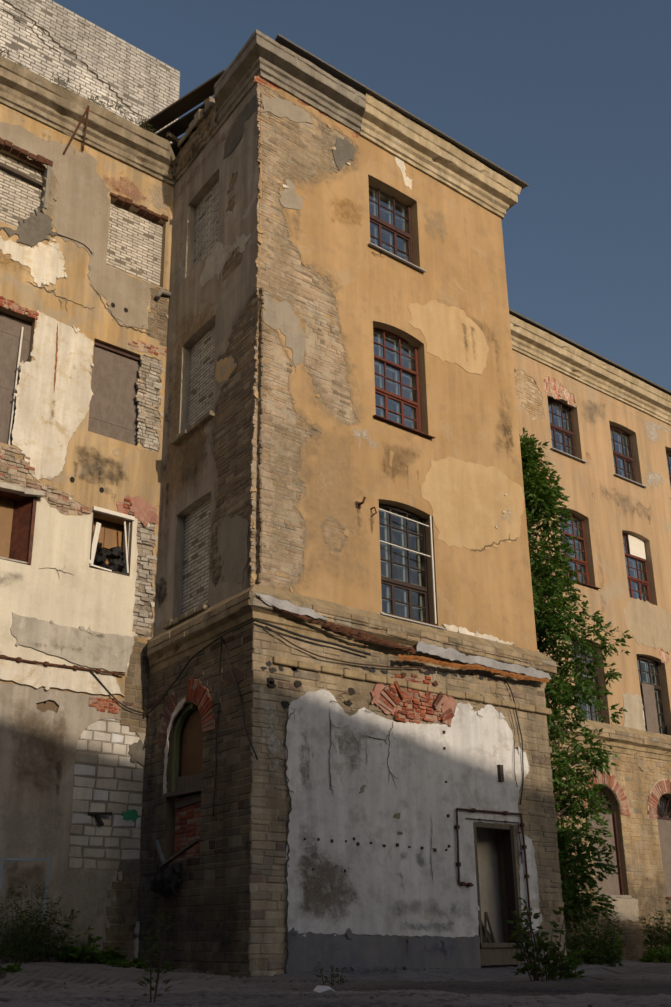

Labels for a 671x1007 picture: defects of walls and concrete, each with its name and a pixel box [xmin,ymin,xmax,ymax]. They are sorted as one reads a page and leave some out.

crack [0,0,147,120]
flaking render [0,232,67,287]
flaking render [200,76,375,592]
flaking render [0,310,159,733]
water stain [80,450,123,482]
crack [329,710,342,797]
crack [367,720,398,786]
flaking render [281,672,542,938]